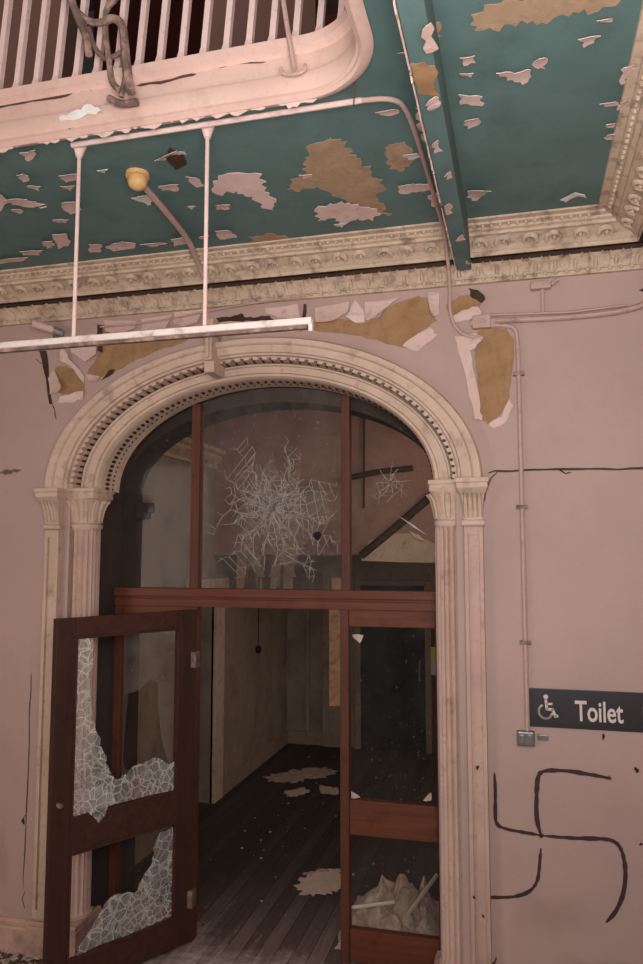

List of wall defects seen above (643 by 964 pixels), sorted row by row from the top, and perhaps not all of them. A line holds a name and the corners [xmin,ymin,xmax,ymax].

peeling [496,57,548,85]
peeling [470,0,620,32]
peeling [578,35,601,47]
peeling [288,0,470,270]
peeling [0,174,82,264]
peeling [88,237,187,253]
peeling [155,147,276,210]
peeling [199,230,237,240]
peeling [560,192,586,202]
peeling [216,288,485,351]
peeling [40,309,203,404]
peeling [455,328,514,428]